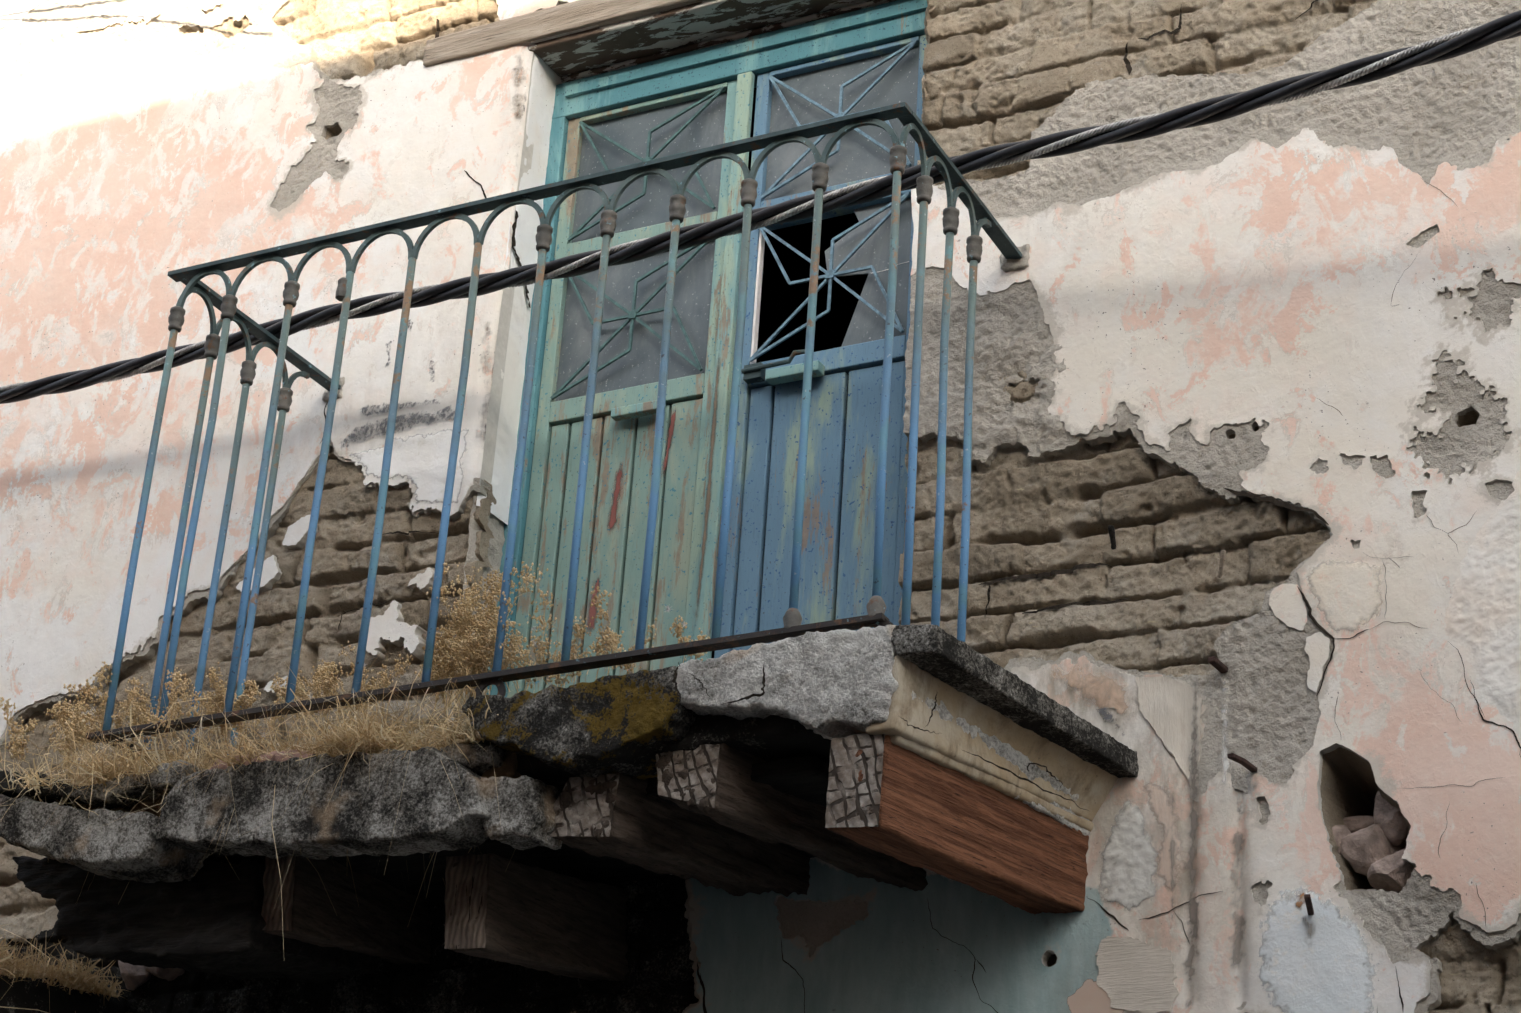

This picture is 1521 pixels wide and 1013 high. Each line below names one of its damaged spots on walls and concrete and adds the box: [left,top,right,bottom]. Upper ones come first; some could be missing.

flaking render [0,0,578,212]
flaking render [917,0,1521,218]
flaking render [1408,226,1440,248]
flaking render [0,440,505,785]
flaking render [898,267,1521,1013]
crack [1297,555,1521,857]
flaking render [0,837,702,1013]
crack [927,898,998,1013]
water stain [1295,892,1313,936]